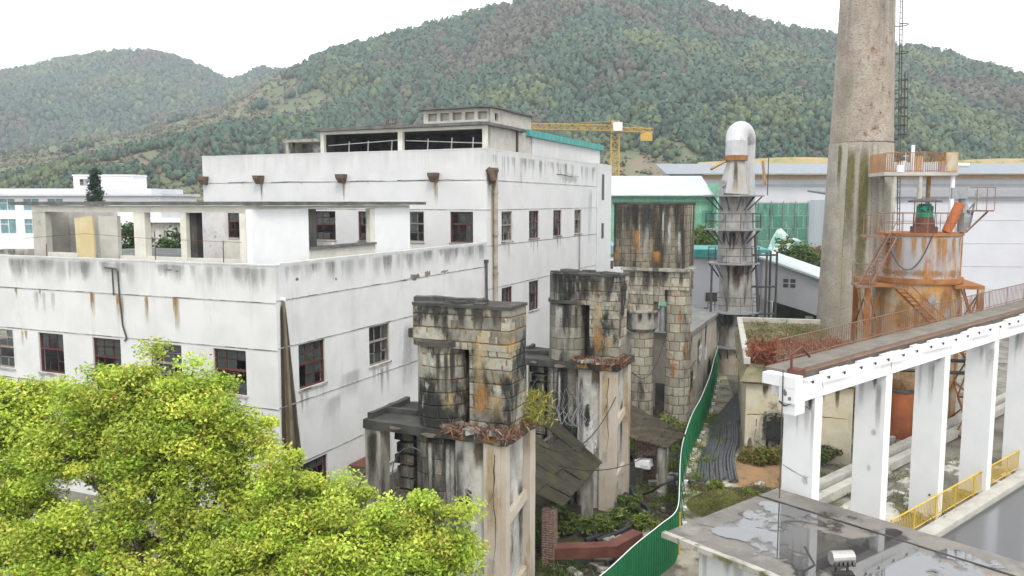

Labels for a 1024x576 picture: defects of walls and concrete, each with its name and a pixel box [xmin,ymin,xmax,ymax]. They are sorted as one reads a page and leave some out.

leakage [837,147,855,221]
rust [884,238,963,277]
crack [487,455,496,564]